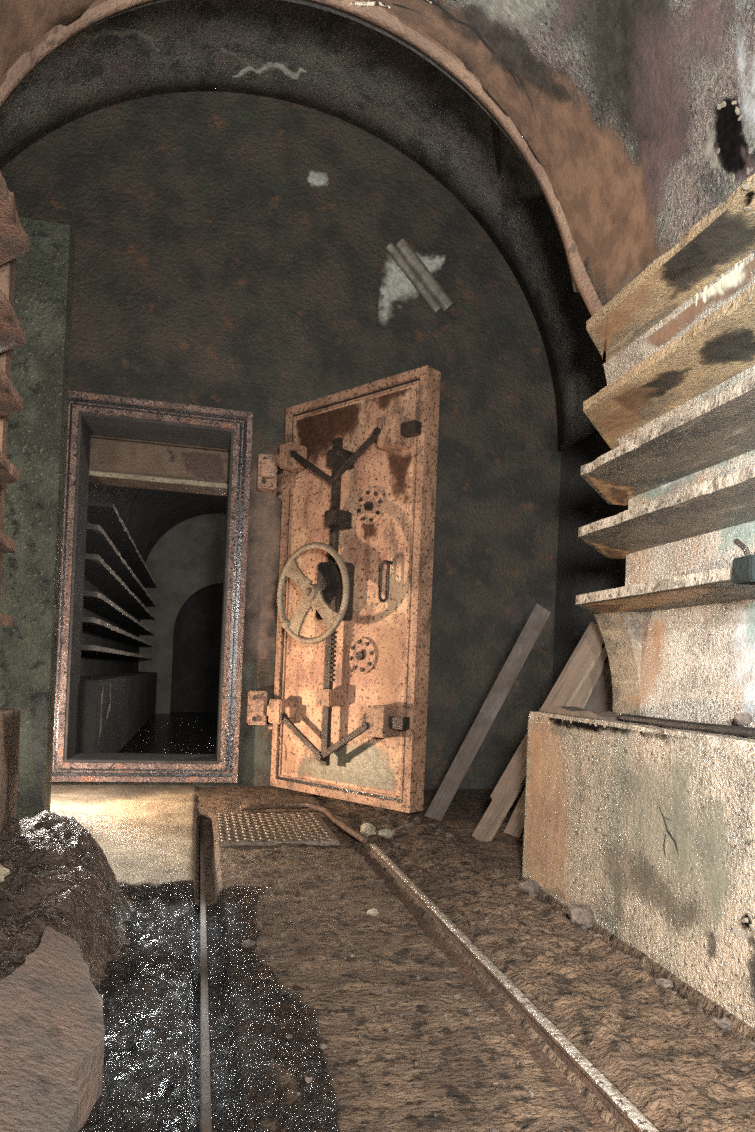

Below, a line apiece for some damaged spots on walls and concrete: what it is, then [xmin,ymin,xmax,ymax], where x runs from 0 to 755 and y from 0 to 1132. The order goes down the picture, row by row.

water stain [662,211,755,306]
water stain [700,330,755,364]
water stain [614,369,689,410]
corrosion [296,388,409,464]
corrosion [389,454,412,502]
corrosion [362,523,376,540]
corrosion [247,451,281,696]